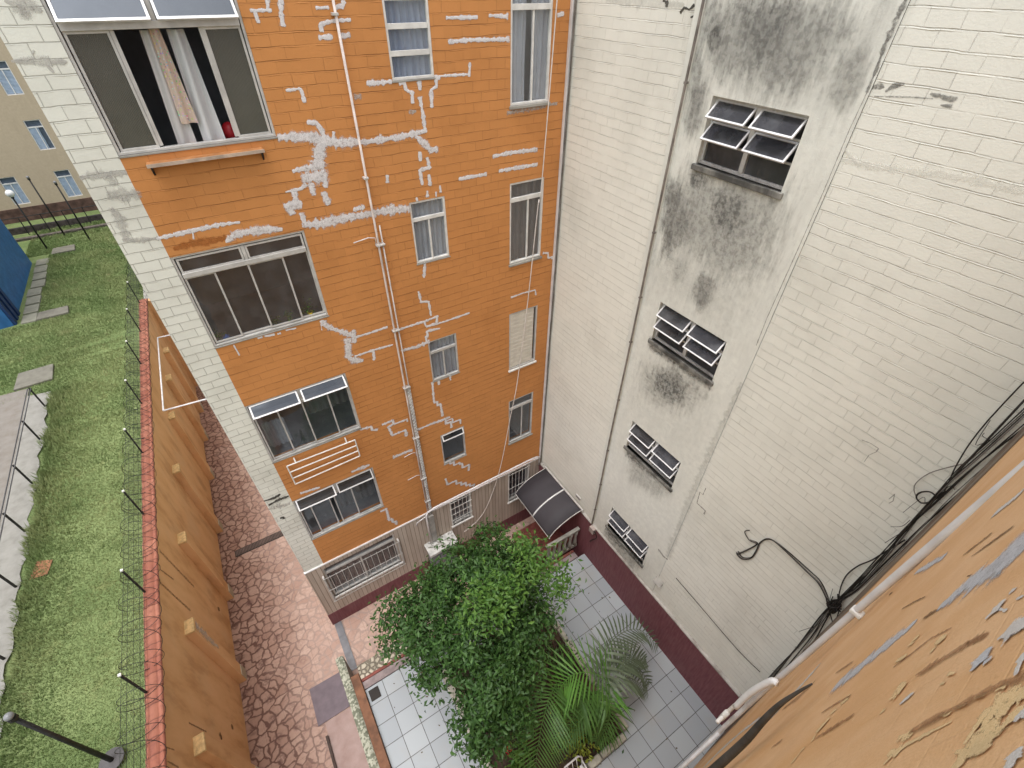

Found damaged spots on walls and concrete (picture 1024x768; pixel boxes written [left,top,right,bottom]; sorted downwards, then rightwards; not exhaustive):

crack [315,0,351,40]
crack [157,13,538,243]
crack [320,263,470,364]
crack [351,375,461,473]
crack [444,460,475,487]
peeling [985,588,1024,646]
peeling [880,652,1024,768]